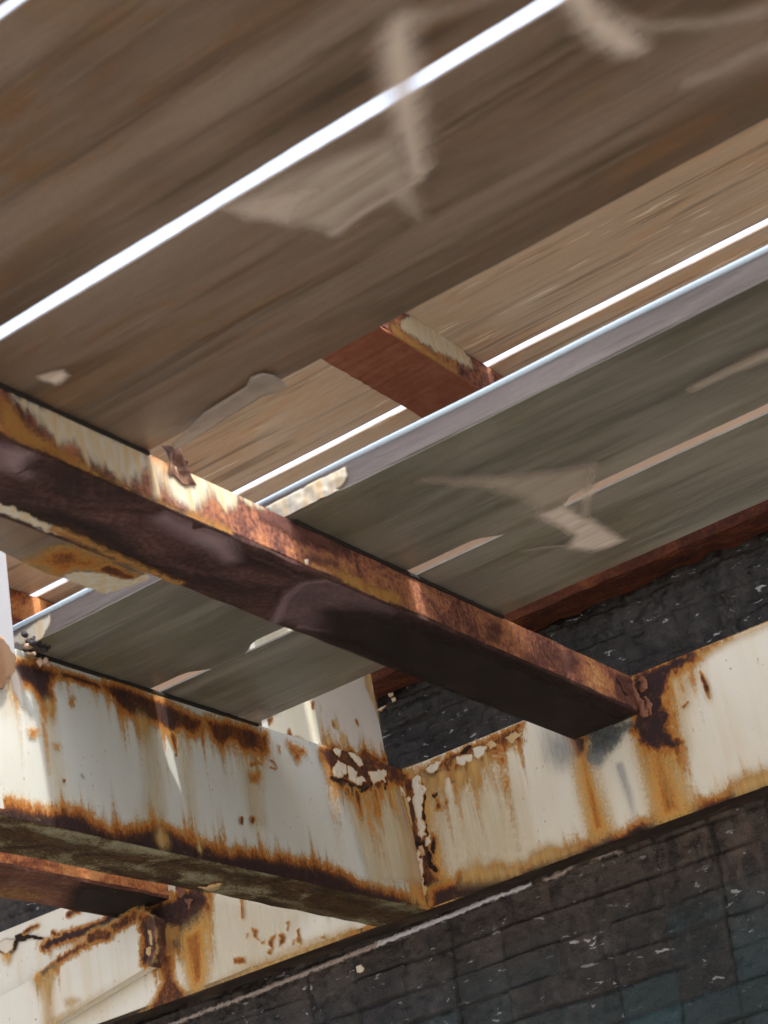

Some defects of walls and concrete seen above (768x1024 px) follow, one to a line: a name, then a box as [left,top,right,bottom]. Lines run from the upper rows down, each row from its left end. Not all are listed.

rust [0,399,98,477]
rust [27,526,184,585]
rust [186,512,232,535]
rust [260,510,339,566]
rust [487,500,768,643]
rust [0,621,768,978]
peeling [318,720,525,855]
rust [22,886,214,1024]